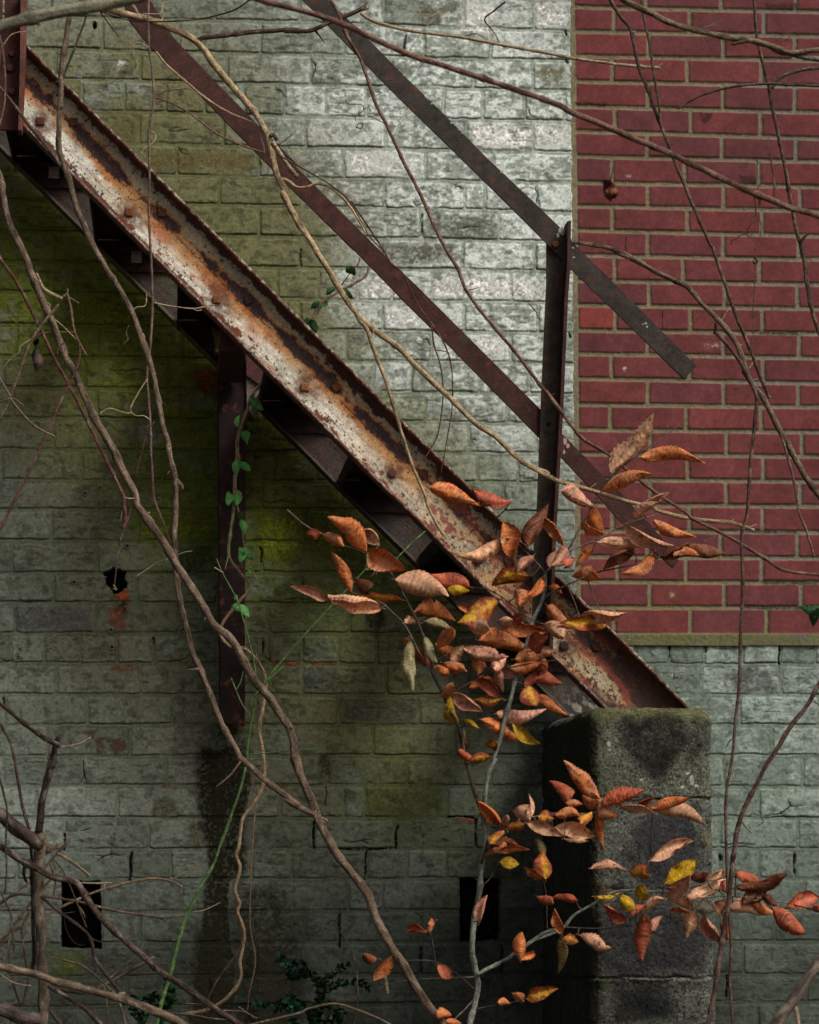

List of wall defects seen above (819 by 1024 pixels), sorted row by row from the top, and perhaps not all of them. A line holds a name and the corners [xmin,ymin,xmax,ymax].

spalling [107,571,128,600]
water stain [624,717,705,776]
water stain [188,726,249,1024]
water stain [246,891,303,1024]